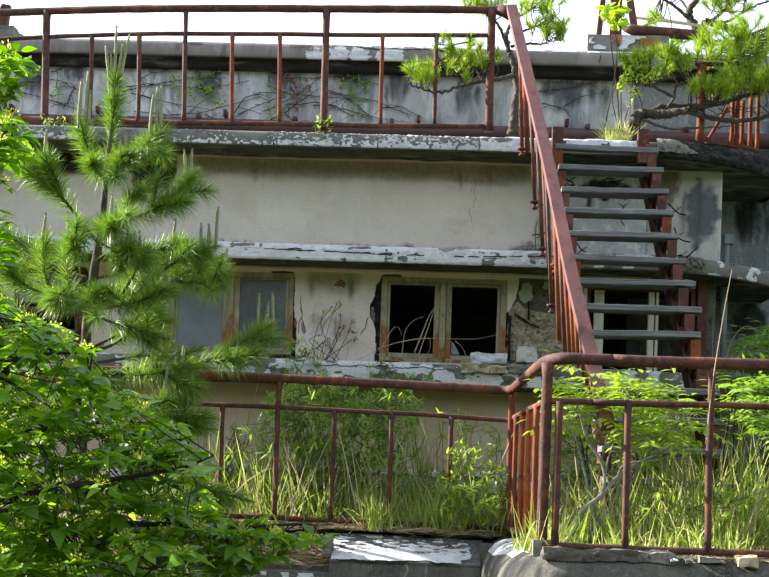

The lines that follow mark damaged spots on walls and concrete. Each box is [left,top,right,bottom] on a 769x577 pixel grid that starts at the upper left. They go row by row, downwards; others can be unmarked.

peeling [24,125,80,139]
peeling [563,139,637,155]
peeling [622,266,656,276]
spalling [681,256,725,276]
peeling [737,267,768,282]
peeling [190,241,568,386]
peeling [527,376,542,388]
spalling [553,364,584,388]
peeling [602,369,685,388]
peeling [331,533,472,564]